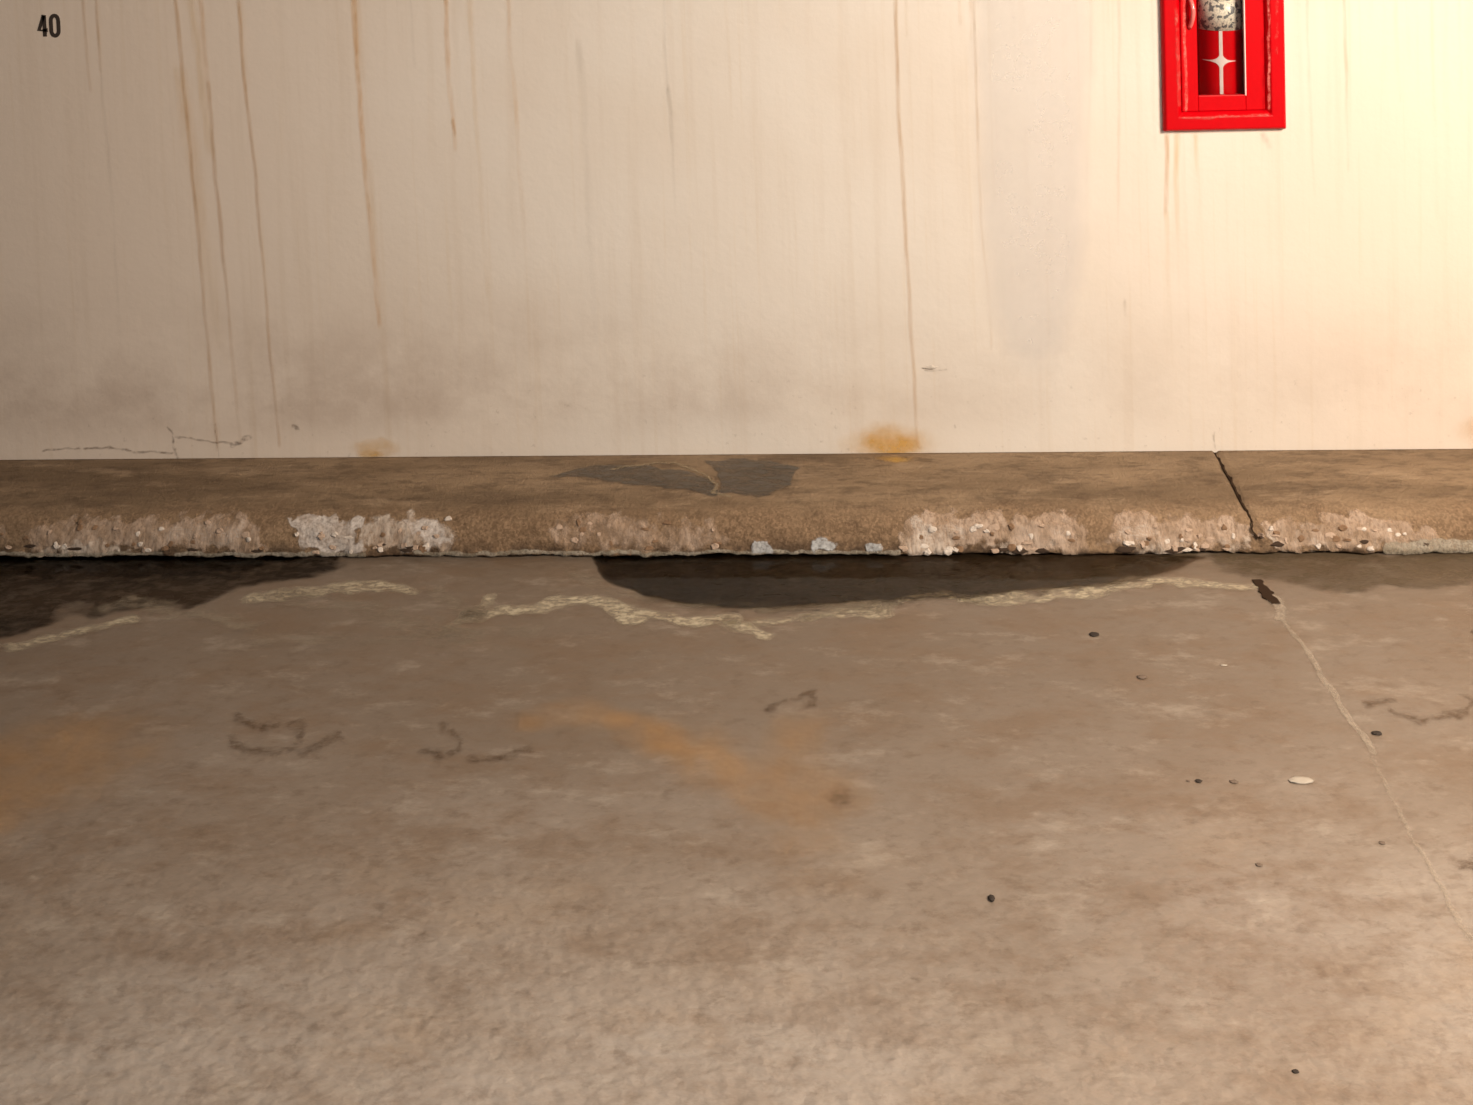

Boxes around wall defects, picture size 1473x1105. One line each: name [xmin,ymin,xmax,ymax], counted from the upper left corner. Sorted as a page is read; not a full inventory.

crack [1214,452,1259,540]
water stain [0,555,415,650]
water stain [448,551,1473,639]
crack [1252,579,1373,753]